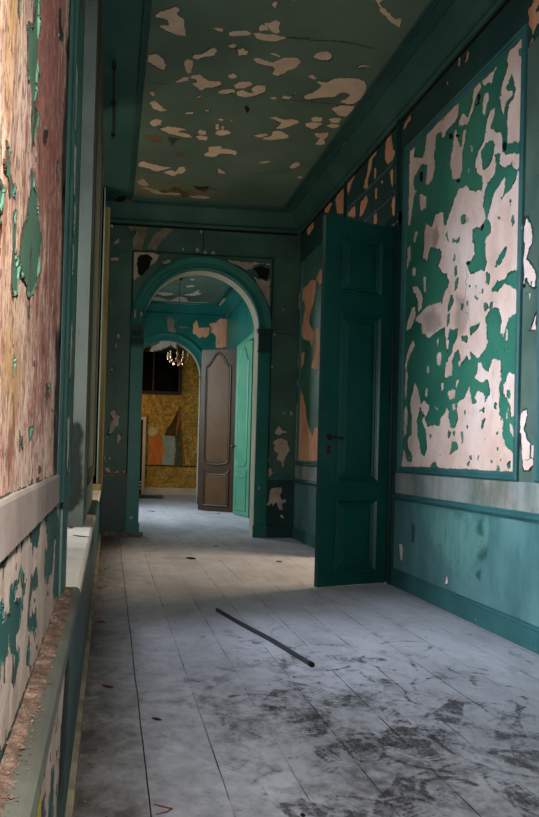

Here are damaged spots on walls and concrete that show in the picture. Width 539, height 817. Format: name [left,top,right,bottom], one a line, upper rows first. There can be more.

peeling [153,6,188,36]
peeling [145,90,238,157]
peeling [212,20,301,77]
peeling [174,48,369,145]
peeling [325,133,396,224]
peeling [0,0,79,500]
peeling [401,0,539,472]
peeling [150,316,227,352]
peeling [299,269,322,373]
peeling [268,378,318,476]
peeling [0,504,60,760]
peeling [36,669,66,817]